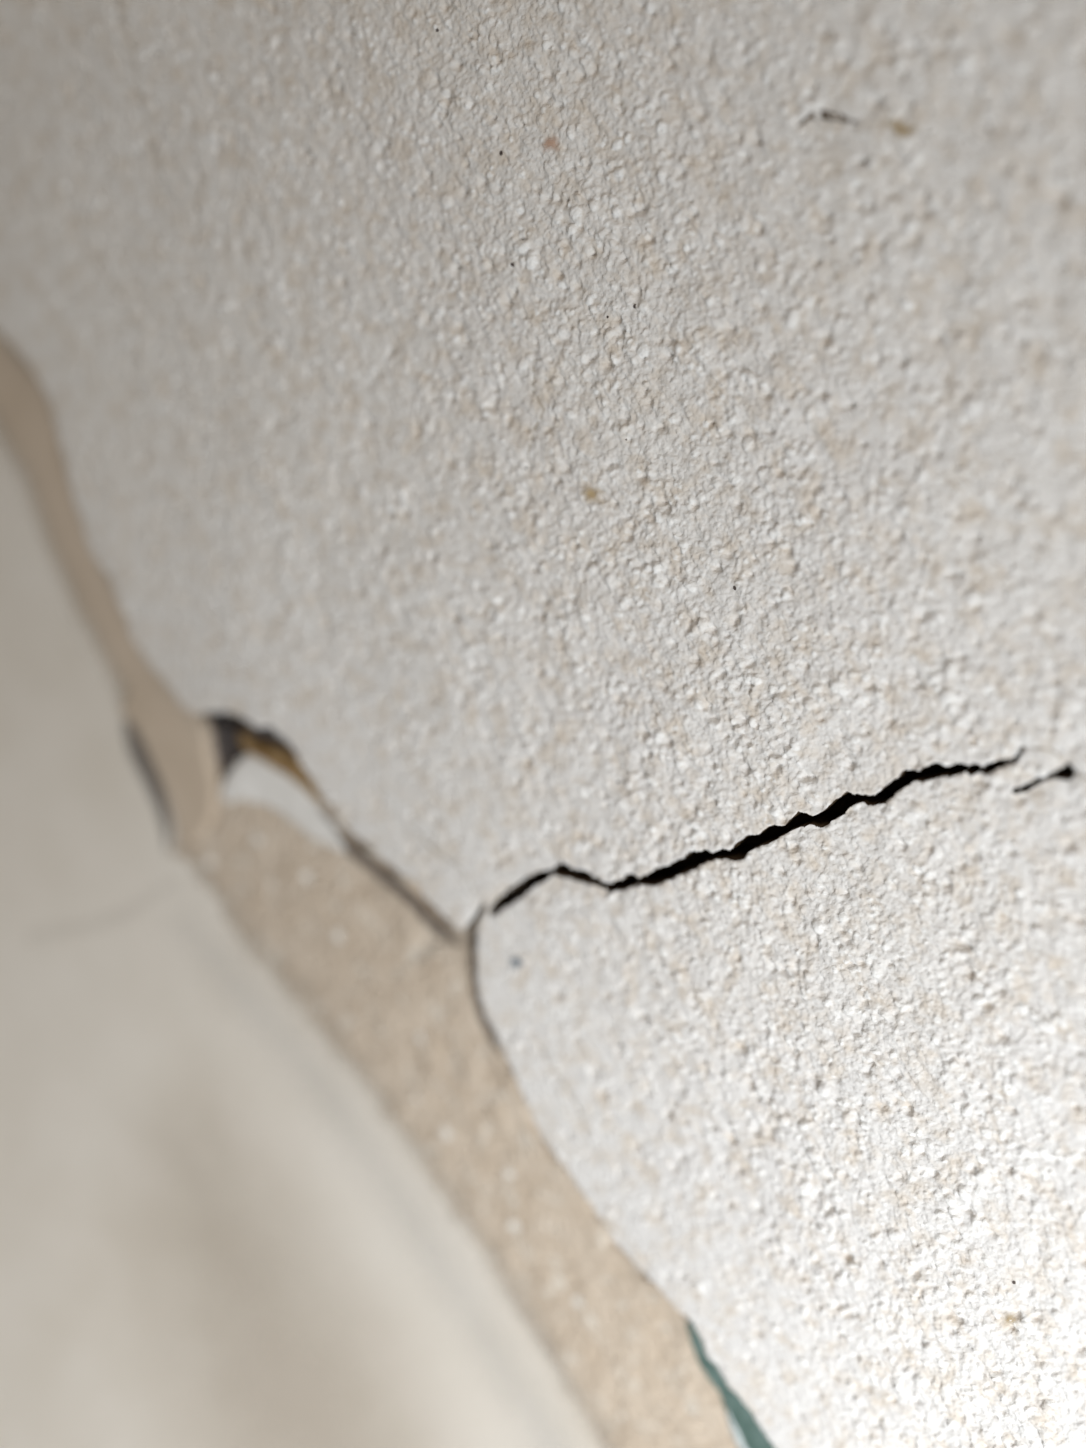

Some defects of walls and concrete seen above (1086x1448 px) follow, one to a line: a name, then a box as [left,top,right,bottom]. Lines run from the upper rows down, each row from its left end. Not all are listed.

spalling [205,712,347,855]
crack [321,746,1086,1057]
spalling [686,1320,774,1448]